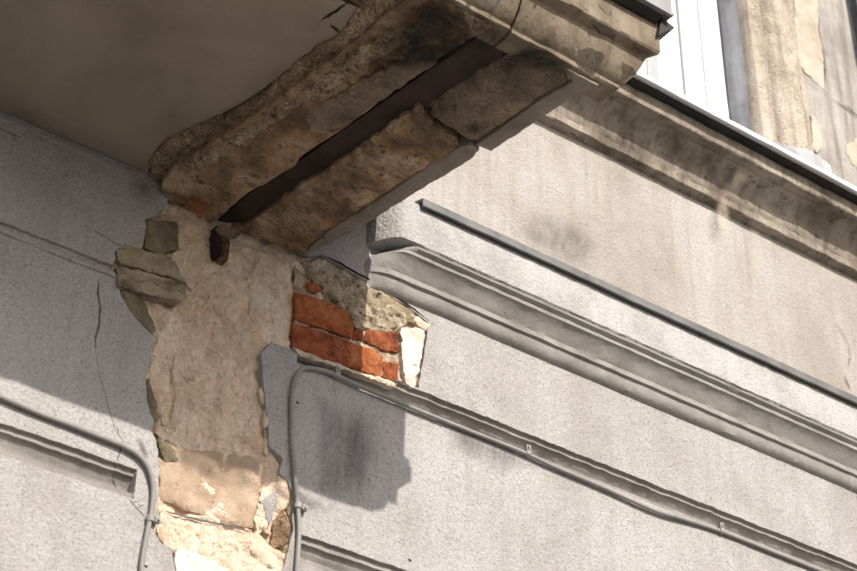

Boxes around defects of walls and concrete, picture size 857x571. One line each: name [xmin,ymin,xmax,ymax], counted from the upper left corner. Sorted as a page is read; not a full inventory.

peeling [187,24,437,175]
peeling [793,0,825,91]
peeling [809,116,823,154]
crack [94,278,146,518]
flaking render [111,204,430,571]